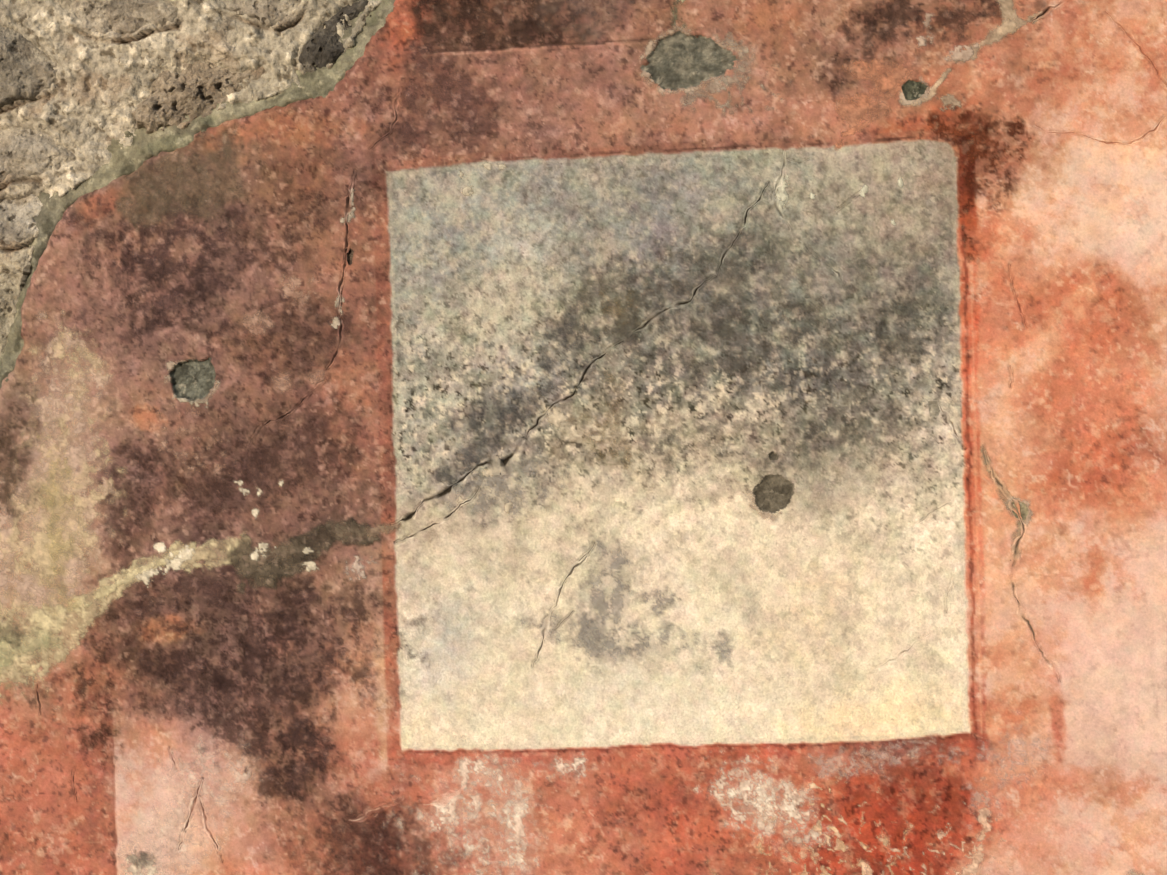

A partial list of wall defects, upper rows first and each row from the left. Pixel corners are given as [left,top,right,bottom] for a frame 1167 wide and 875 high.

spalling [0,0,395,388]
crack [246,87,403,460]
flaking render [640,26,748,111]
crack [900,0,1069,106]
crack [1035,11,1167,146]
crack [0,149,851,715]
crack [937,402,1062,682]
crack [70,768,78,802]
water stain [76,663,111,708]
water stain [136,565,389,801]